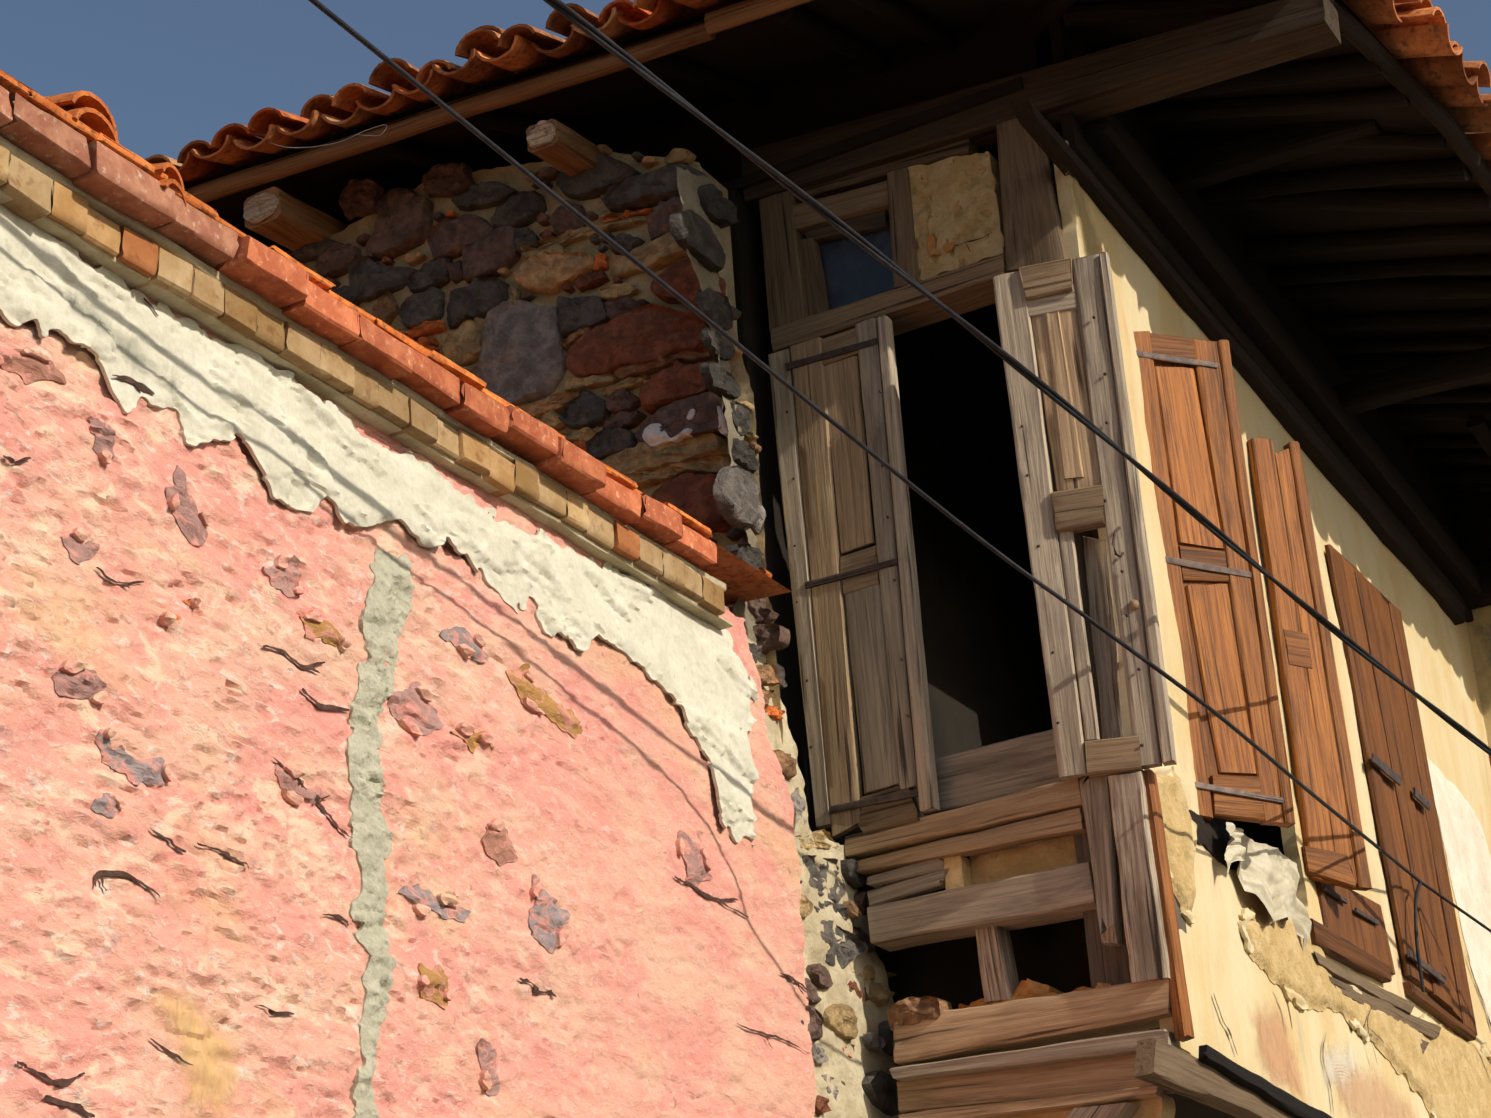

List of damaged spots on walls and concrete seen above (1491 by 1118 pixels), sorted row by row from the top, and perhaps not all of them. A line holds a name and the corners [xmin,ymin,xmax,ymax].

peeling [0,345,67,384]
peeling [86,417,116,465]
peeling [164,465,212,546]
peeling [261,553,352,652]
peeling [51,658,108,705]
peeling [387,681,494,754]
peeling [505,663,583,739]
peeling [90,727,173,818]
damp [345,550,415,1118]
peeling [480,818,518,866]
peeling [1149,763,1240,924]
peeling [1237,900,1491,1118]